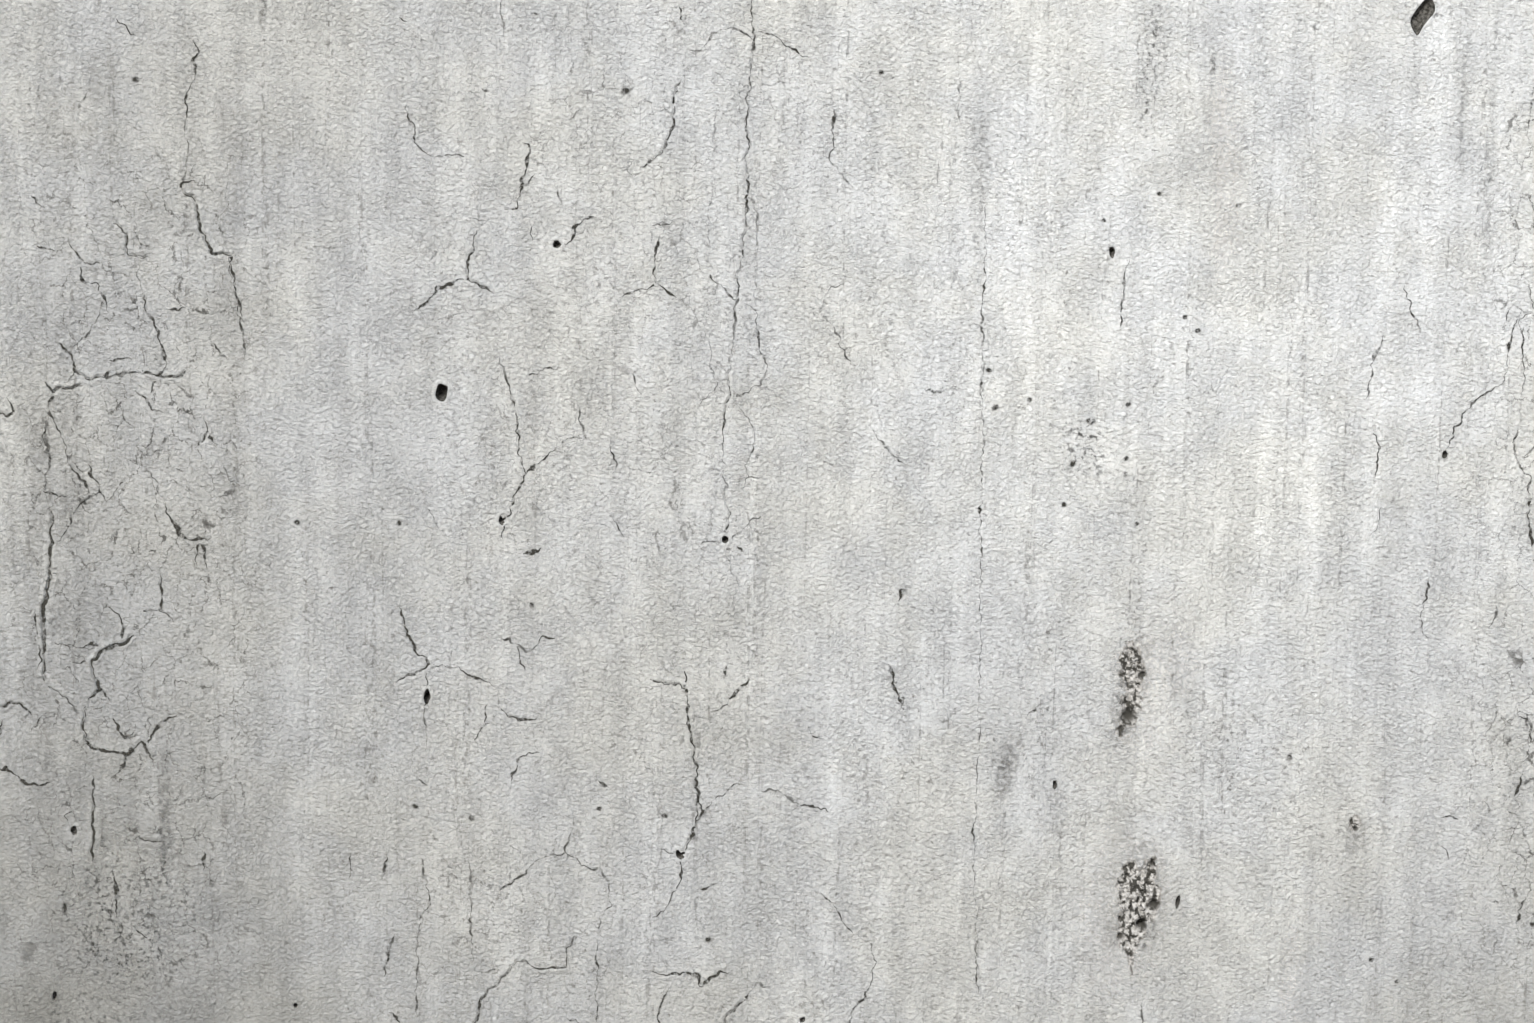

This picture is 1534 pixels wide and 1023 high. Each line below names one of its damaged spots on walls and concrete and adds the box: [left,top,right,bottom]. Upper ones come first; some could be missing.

crack [407,113,464,157]
crack [414,142,594,311]
crack [619,0,808,551]
crack [0,41,246,938]
crack [501,367,618,555]
crack [1448,280,1534,549]
crack [392,603,555,785]
crack [648,666,828,917]
crack [1420,583,1430,637]
crack [1509,716,1532,813]
crack [464,834,612,1023]
crack [649,965,770,1023]